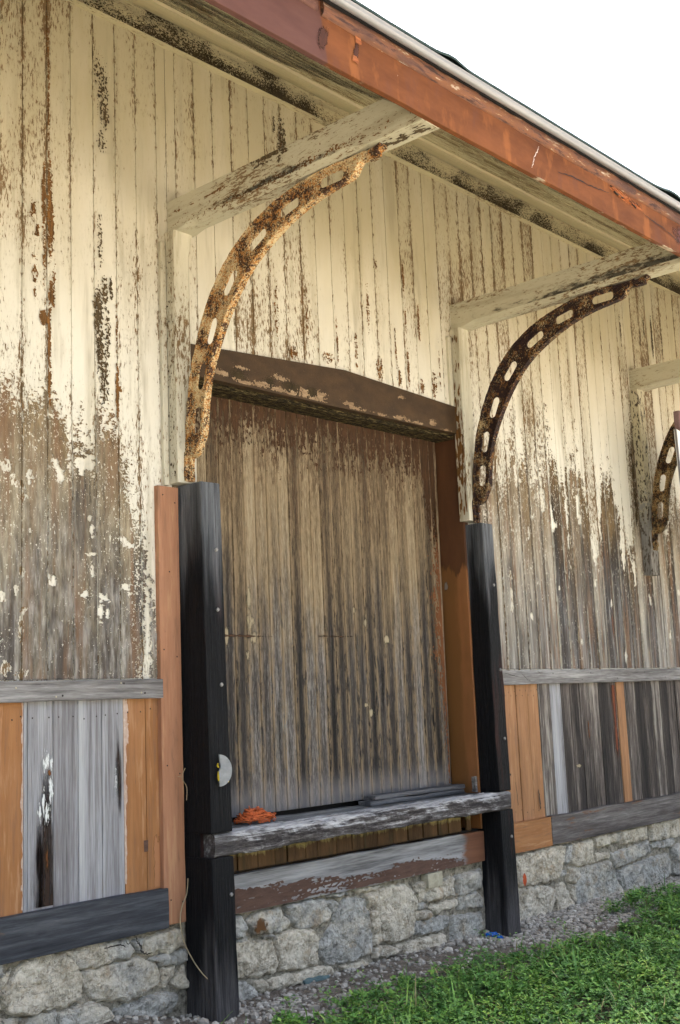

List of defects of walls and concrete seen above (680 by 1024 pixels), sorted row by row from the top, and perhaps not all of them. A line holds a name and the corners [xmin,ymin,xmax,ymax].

water stain [79,0,391,122]
peeling [173,110,431,226]
water stain [391,145,609,257]
peeling [0,0,158,680]
peeling [215,366,329,403]
peeling [274,280,303,360]
peeling [343,306,680,669]
peeling [235,852,465,914]